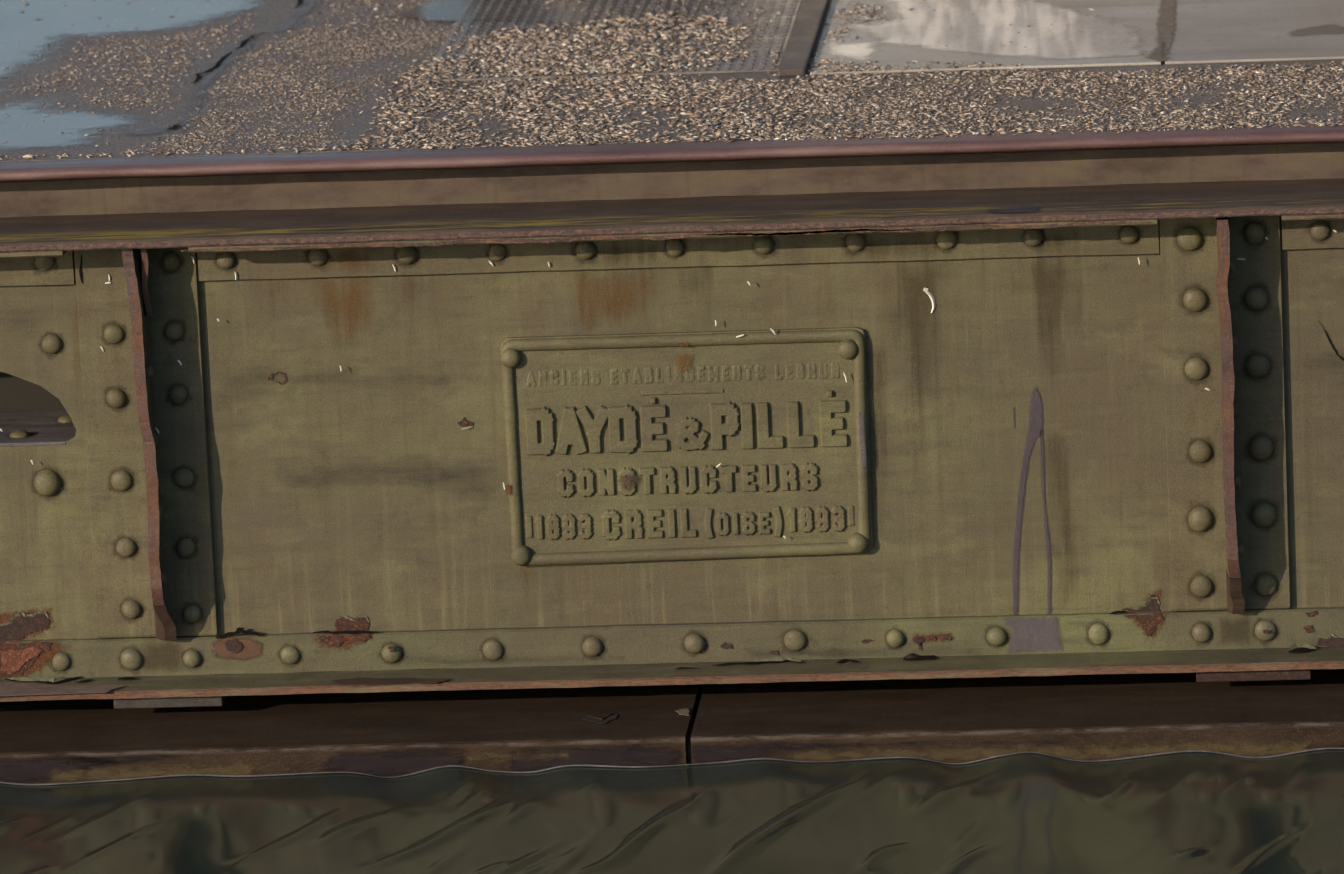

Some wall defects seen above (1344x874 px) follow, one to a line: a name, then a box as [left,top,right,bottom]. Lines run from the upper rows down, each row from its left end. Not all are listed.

crack [126,0,322,135]
crack [1319,322,1344,361]
corrosion [0,610,70,679]
corrosion [313,615,379,649]
corrosion [912,633,951,650]
corrosion [1109,592,1166,637]
corrosion [1303,610,1344,647]